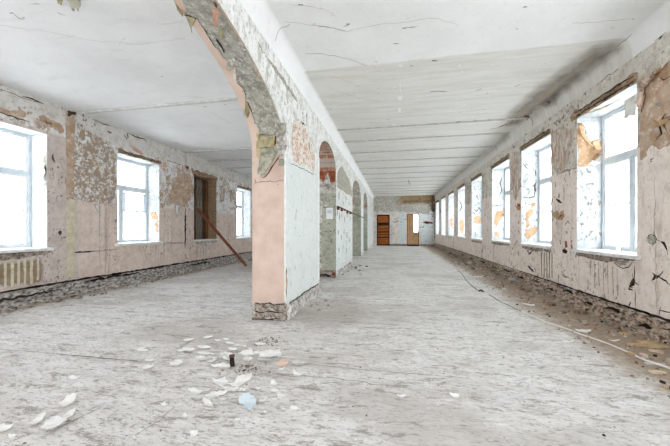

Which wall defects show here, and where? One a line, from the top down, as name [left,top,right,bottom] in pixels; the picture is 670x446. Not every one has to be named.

crack [275,4,457,41]
spalling [0,107,32,122]
spalling [66,111,117,205]
spalling [152,157,192,216]
peeling [174,0,361,320]
peeling [583,61,670,160]